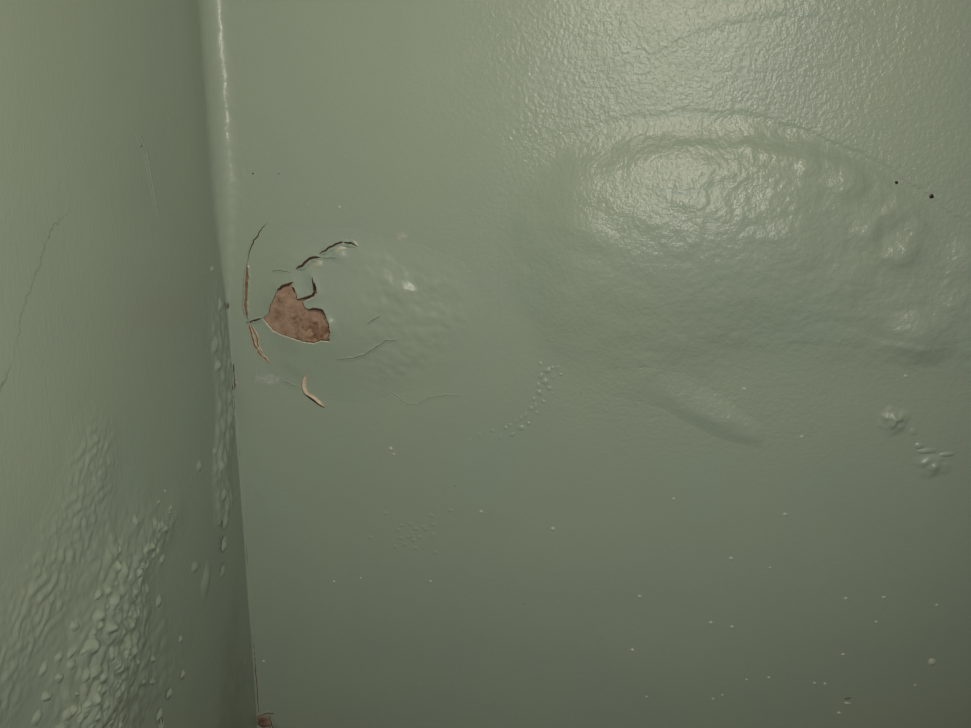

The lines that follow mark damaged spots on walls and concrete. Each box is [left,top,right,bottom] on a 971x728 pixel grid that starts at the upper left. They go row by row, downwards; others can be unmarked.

peeling [262,278,330,344]
peeling [302,374,325,408]